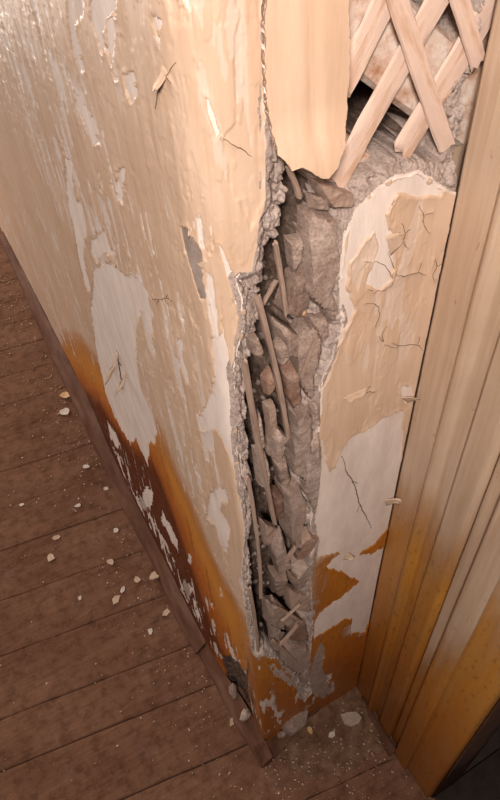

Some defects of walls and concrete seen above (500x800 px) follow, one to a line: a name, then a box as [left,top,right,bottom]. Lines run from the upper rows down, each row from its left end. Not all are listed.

peeling [68,0,117,71]
flaking render [471,0,485,33]
peeling [151,65,167,93]
peeling [72,85,100,148]
peeling [182,227,208,299]
crack [367,206,440,351]
flaking render [197,0,471,711]
peeling [64,158,203,627]
crack [341,456,372,528]